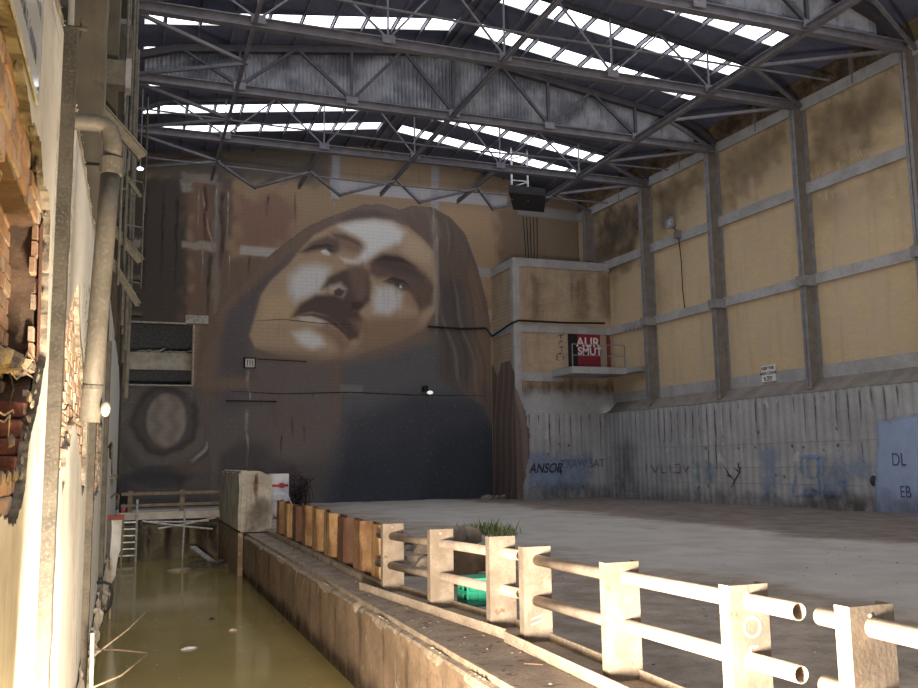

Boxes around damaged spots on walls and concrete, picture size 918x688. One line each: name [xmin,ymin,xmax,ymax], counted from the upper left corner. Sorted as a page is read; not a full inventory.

spalling [0,24,56,517]
spalling [60,290,113,496]